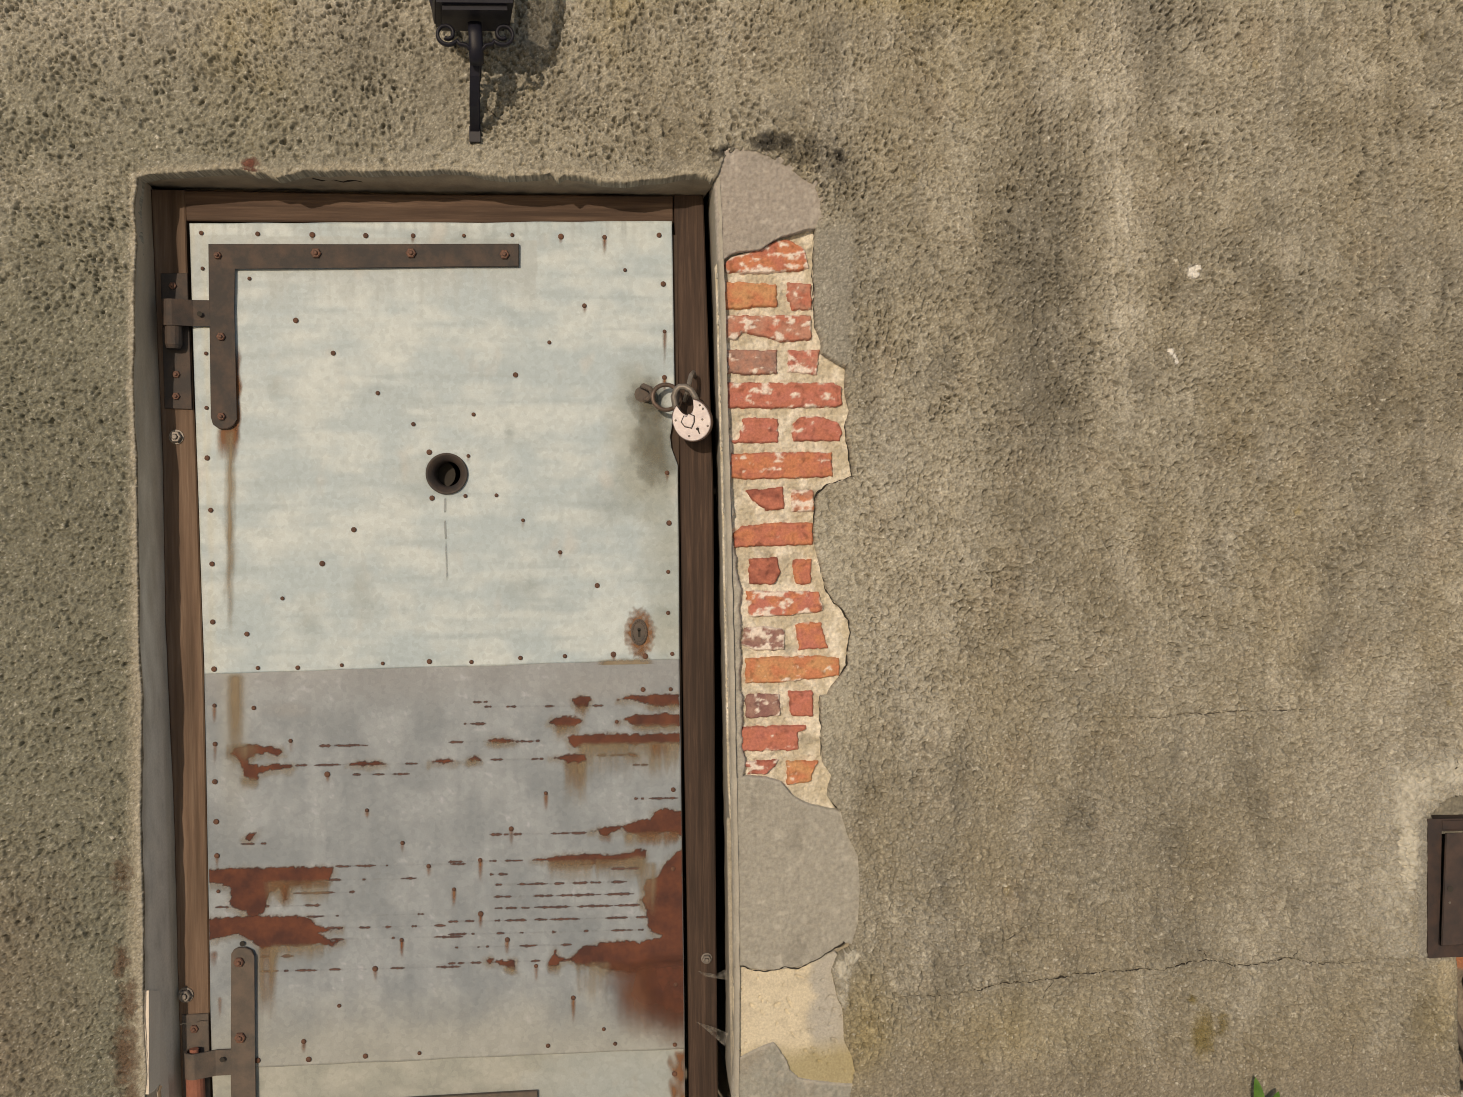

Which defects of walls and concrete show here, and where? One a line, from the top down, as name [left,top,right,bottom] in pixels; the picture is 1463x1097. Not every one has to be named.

rust [220,358,241,579]
spalling [714,231,851,819]
rust [213,676,292,783]
rust [549,694,680,777]
rust [209,866,340,980]
rust [487,942,515,971]
rust [534,808,683,1029]
peeling [732,950,855,1083]
crack [917,950,1426,998]